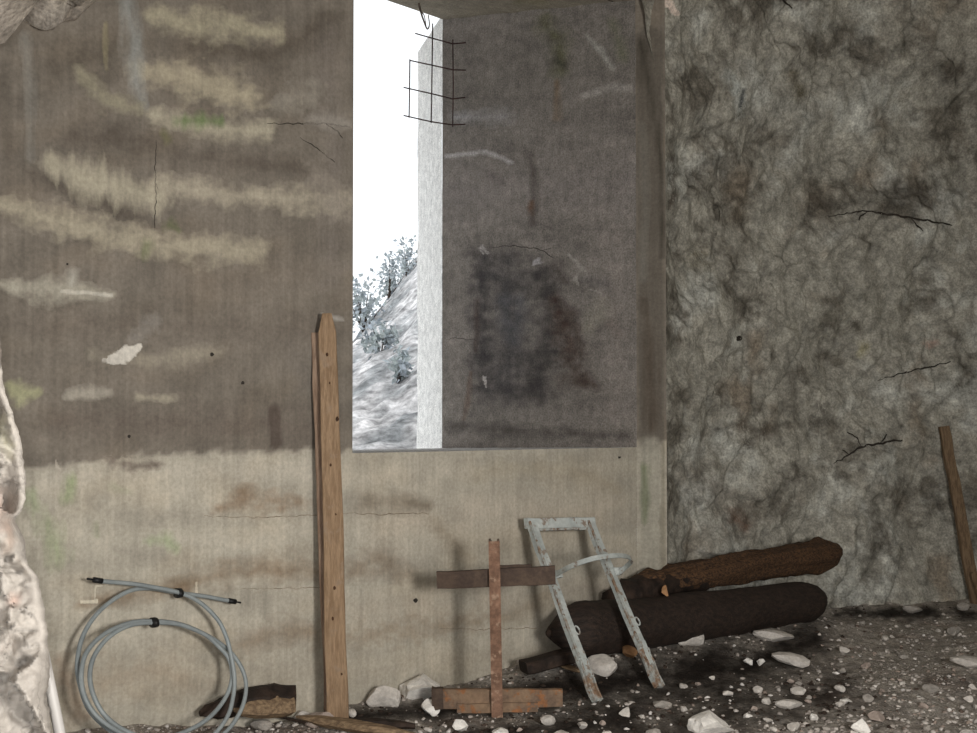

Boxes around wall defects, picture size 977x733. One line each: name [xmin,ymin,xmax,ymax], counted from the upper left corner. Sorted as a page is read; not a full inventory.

water stain [71,0,352,147]
spalling [403,23,466,127]
crack [267,122,350,160]
water stain [0,28,353,312]
crack [828,210,952,231]
water stain [444,8,681,570]
spalling [102,343,143,365]
water stain [84,310,228,373]
crack [878,361,951,381]
water stain [3,377,44,411]
water stain [61,381,115,402]
crack [834,432,903,463]